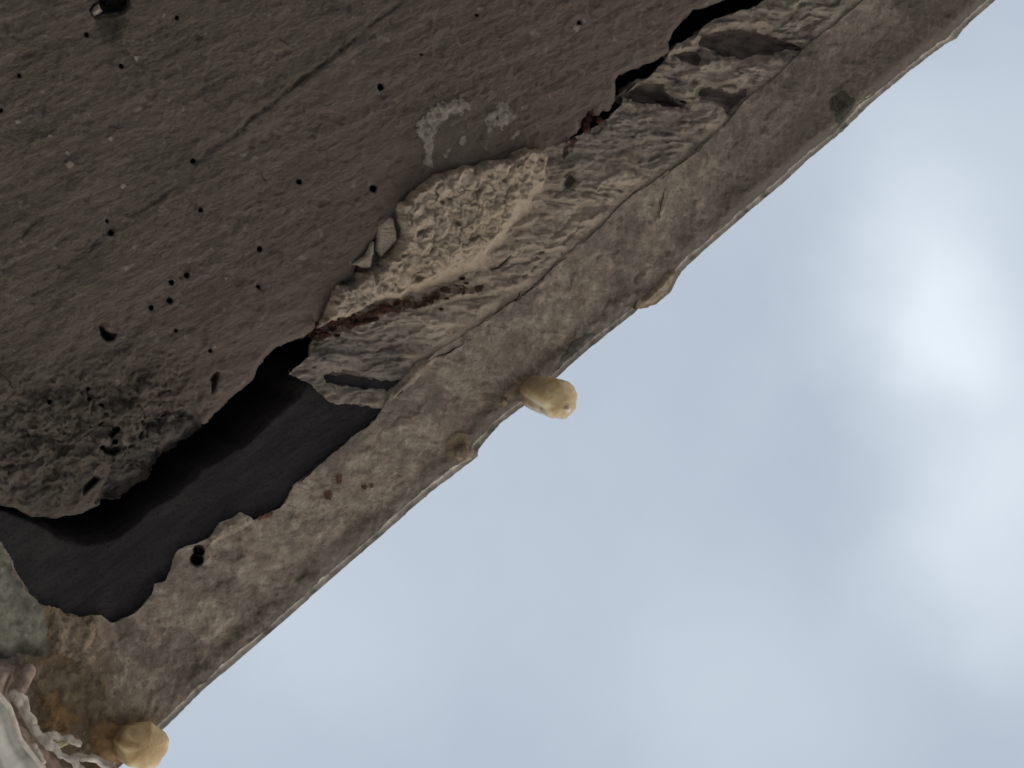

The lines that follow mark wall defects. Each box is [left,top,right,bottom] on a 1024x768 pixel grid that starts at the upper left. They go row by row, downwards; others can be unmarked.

spalling [88,0,131,18]
spalling [571,0,763,137]
water stain [416,98,471,168]
water stain [484,102,520,149]
peeling [352,217,397,268]
corrosion [307,276,484,345]
spalling [0,335,399,668]